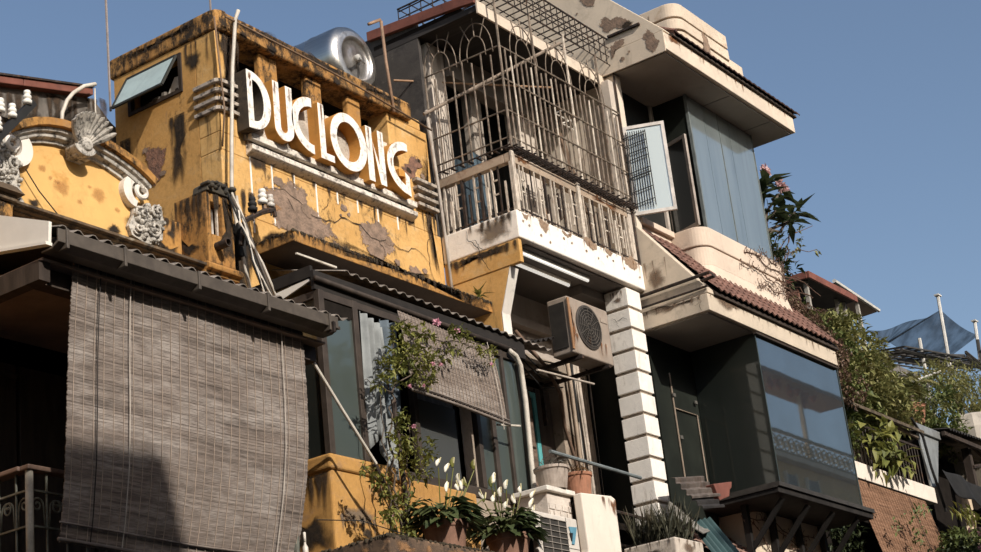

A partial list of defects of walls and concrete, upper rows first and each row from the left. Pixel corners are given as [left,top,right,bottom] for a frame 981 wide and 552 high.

leakage [118,14,350,111]
peeling [599,16,660,61]
spalling [142,145,167,186]
leakage [170,112,186,180]
leakage [248,142,283,173]
peeling [264,176,351,244]
leakage [158,182,493,306]
crack [269,188,435,281]
peeling [359,219,428,274]
leakage [305,472,327,502]
leakage [300,518,330,551]